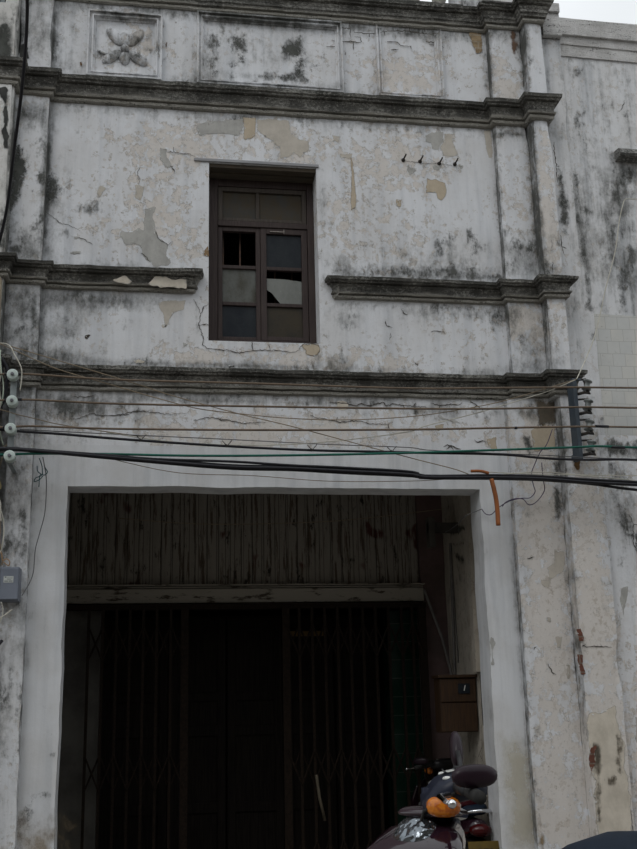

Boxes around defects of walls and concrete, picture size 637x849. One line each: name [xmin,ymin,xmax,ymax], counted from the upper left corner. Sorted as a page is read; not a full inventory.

damp [0,23,29,59]
damp [232,35,246,67]
mould [258,35,309,82]
damp [0,87,26,231]
peeling [197,117,309,158]
peeling [426,131,463,200]
damp [613,168,637,195]
peeling [120,207,187,289]
damp [620,246,634,303]
crack [195,302,316,353]
peeling [620,587,628,620]
peeling [586,706,632,834]